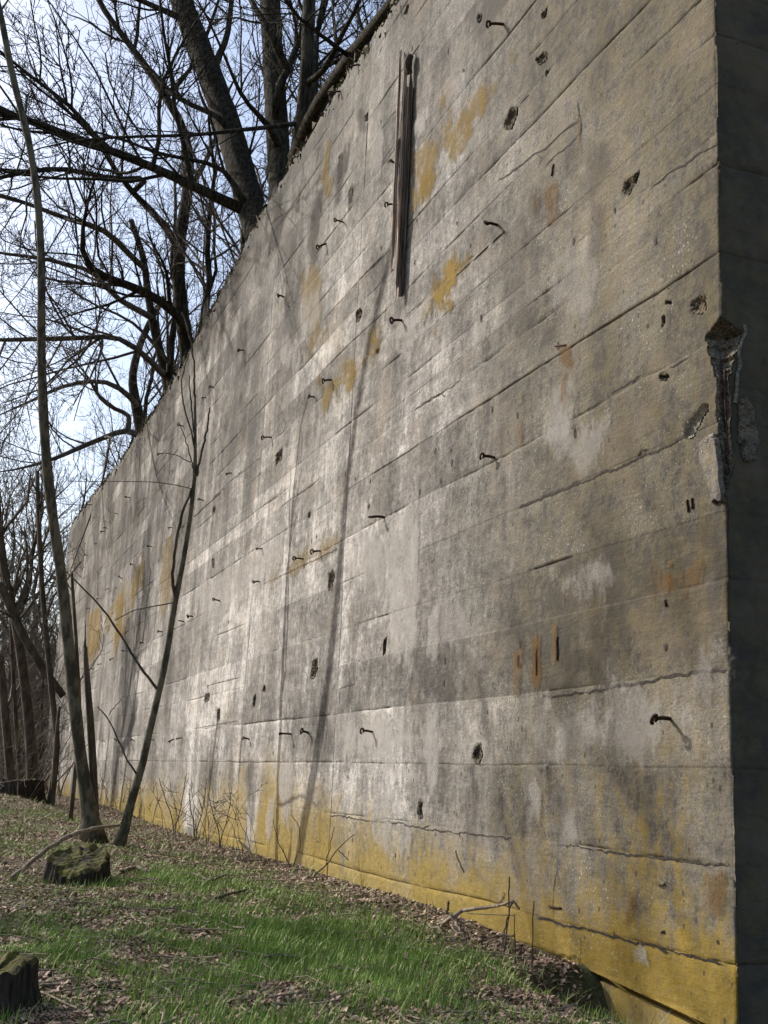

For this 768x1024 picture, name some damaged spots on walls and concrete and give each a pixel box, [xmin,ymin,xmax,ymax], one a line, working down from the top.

crack [499,102,581,180]
spalling [684,320,760,505]
crack [543,669,728,698]
spalling [472,743,483,764]
crack [332,815,510,840]
crack [559,844,728,867]
crack [537,872,722,965]